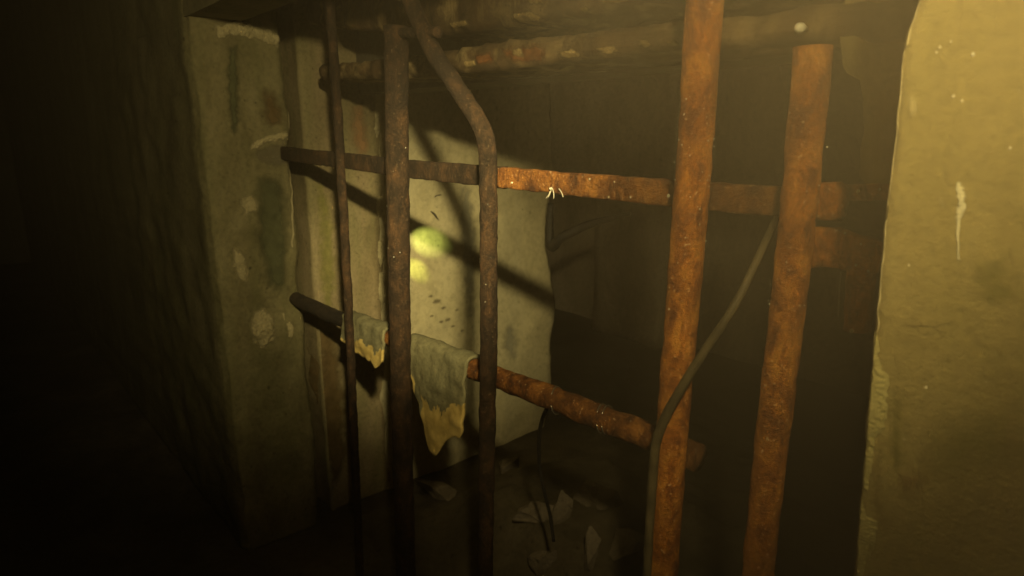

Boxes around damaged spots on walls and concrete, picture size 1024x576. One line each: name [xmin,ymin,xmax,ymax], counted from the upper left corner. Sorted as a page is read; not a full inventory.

spalling [217,21,280,47]
spalling [251,109,295,247]
damp [955,182,966,260]
flaking render [251,310,294,349]